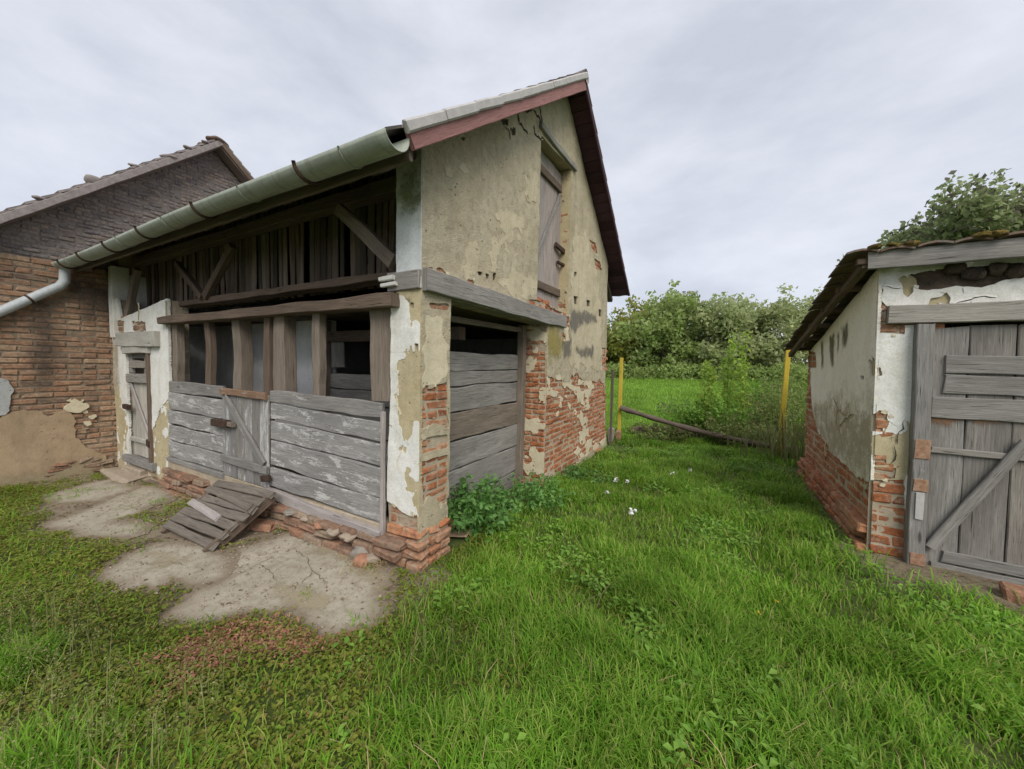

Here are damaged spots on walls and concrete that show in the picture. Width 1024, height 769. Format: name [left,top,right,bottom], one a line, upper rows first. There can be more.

crack [504,106,543,142]
spalling [463,168,608,487]
leakage [821,325,848,367]
spalling [875,263,1023,337]
peeling [0,378,128,487]
peeling [387,295,450,528]
leakage [815,402,871,475]
spalling [804,349,910,559]